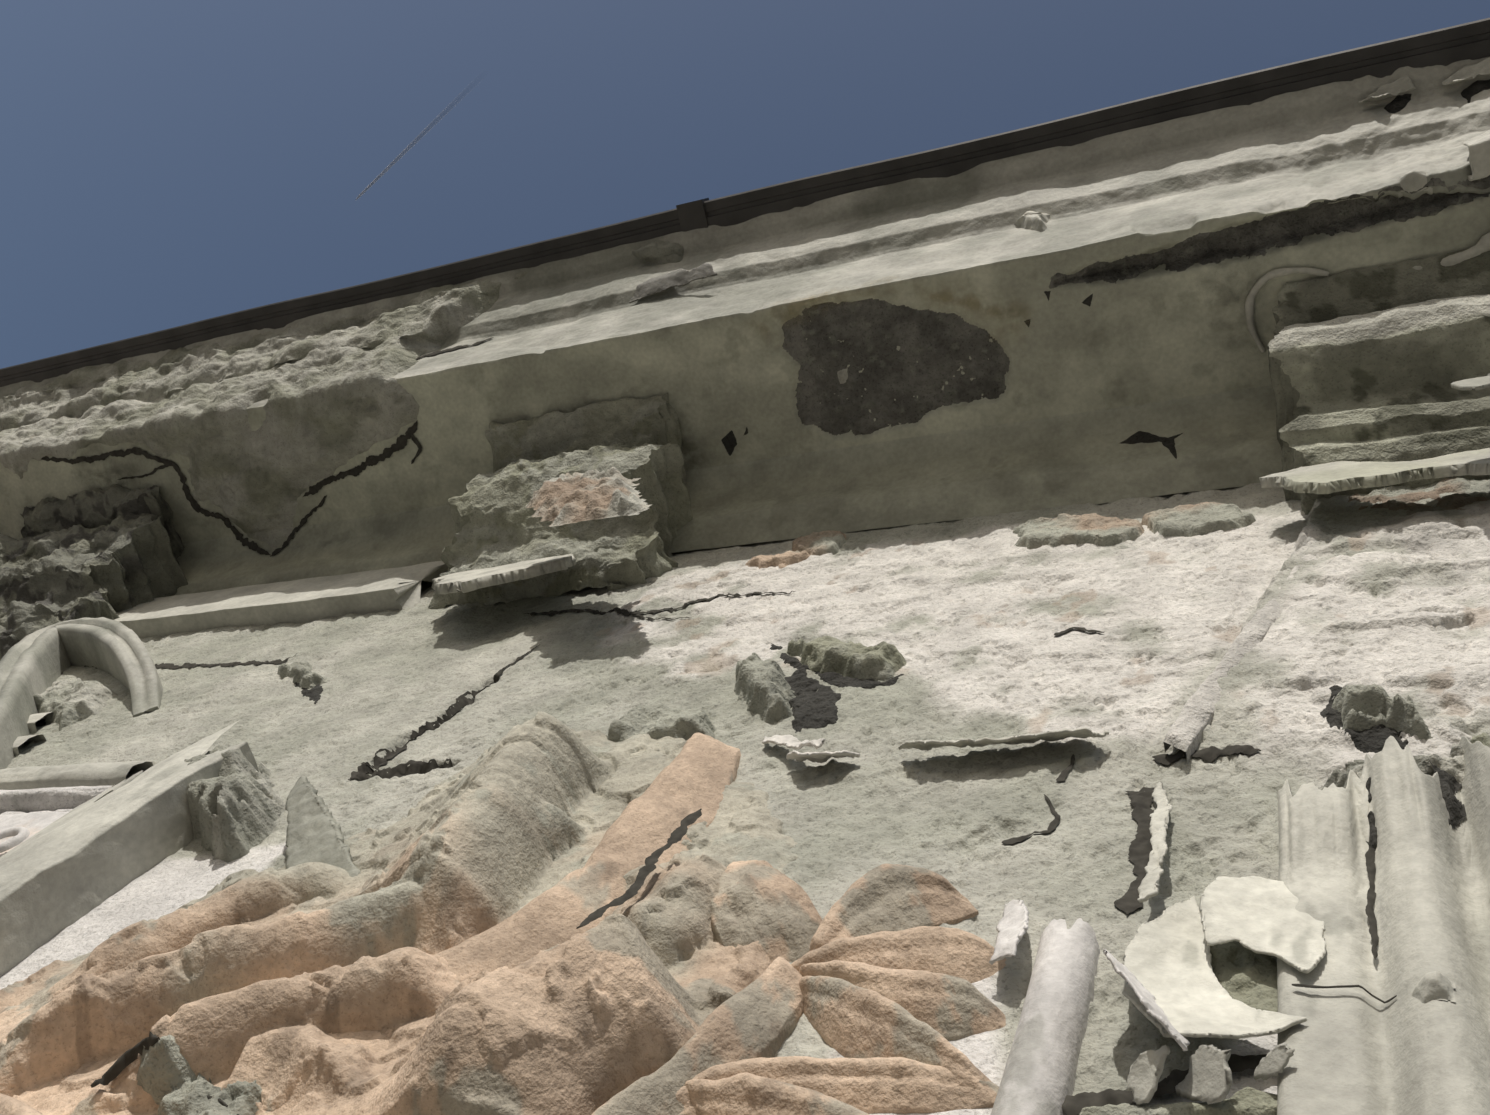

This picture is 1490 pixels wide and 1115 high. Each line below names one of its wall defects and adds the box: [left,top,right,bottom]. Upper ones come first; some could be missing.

peeling [1359,75,1416,114]
peeling [1442,57,1490,103]
flaking render [1044,130,1490,353]
flaking render [782,298,1010,436]
crack [33,420,422,557]
flaking render [526,467,651,527]
crack [348,591,796,781]
peeling [898,727,1109,751]
flaking render [1318,683,1490,851]
peeling [989,900,1029,965]
peeling [1079,782,1326,1115]